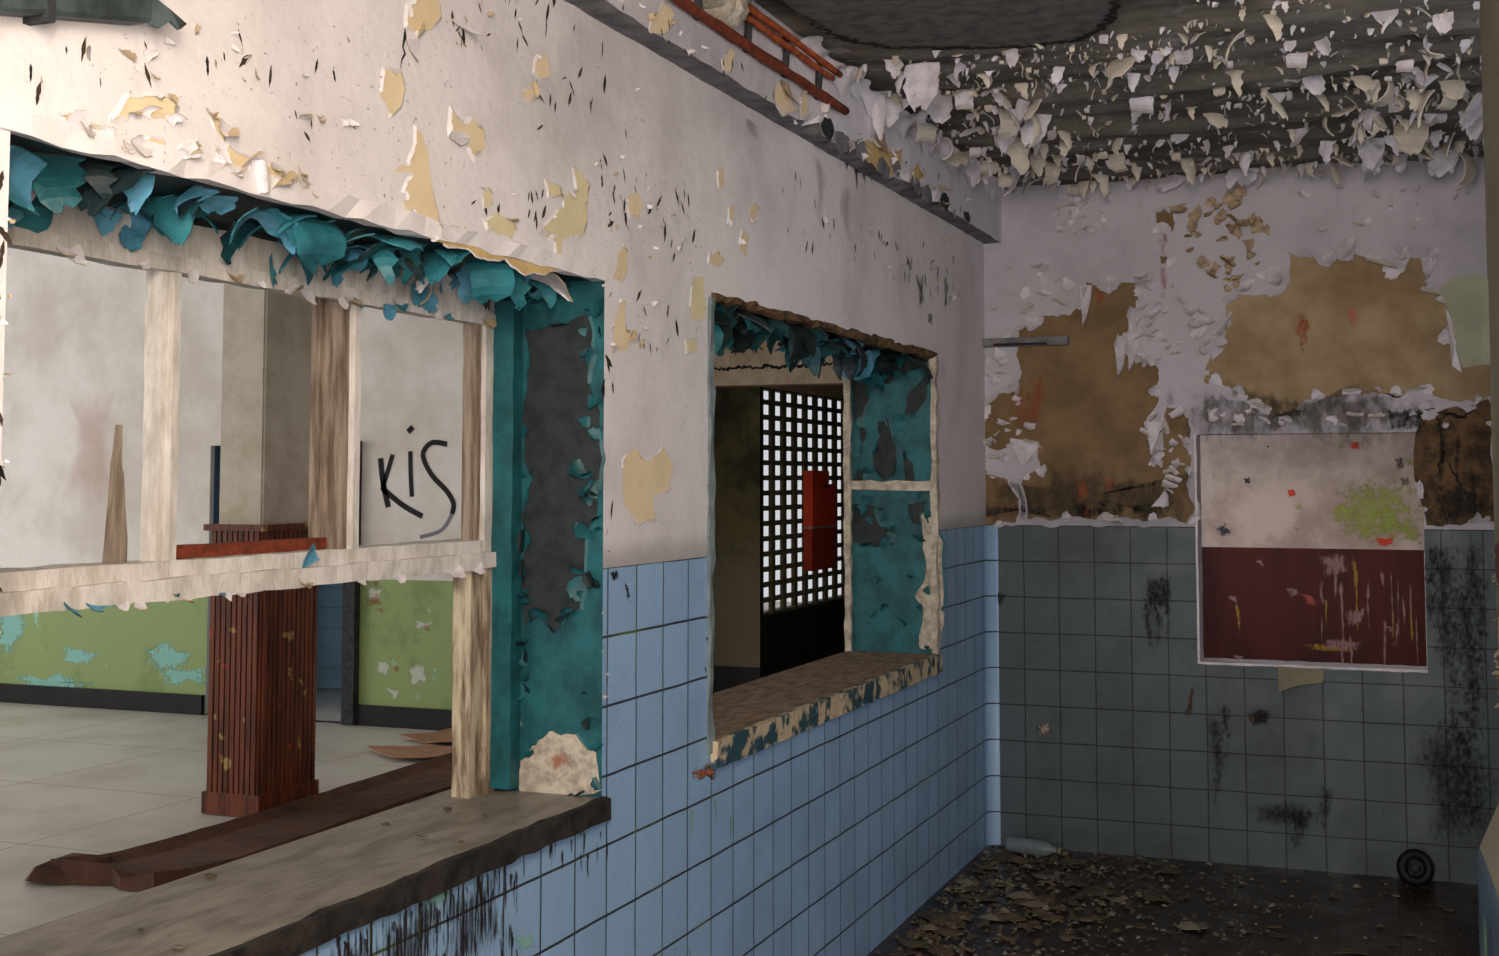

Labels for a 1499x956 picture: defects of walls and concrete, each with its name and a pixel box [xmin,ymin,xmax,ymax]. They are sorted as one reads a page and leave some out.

peeling [403,0,606,111]
peeling [622,0,1494,530]
peeling [0,29,959,728]
water stain [1144,578,1169,639]
water stain [1321,489,1490,835]
spalling [510,717,603,797]
water stain [336,855,525,956]